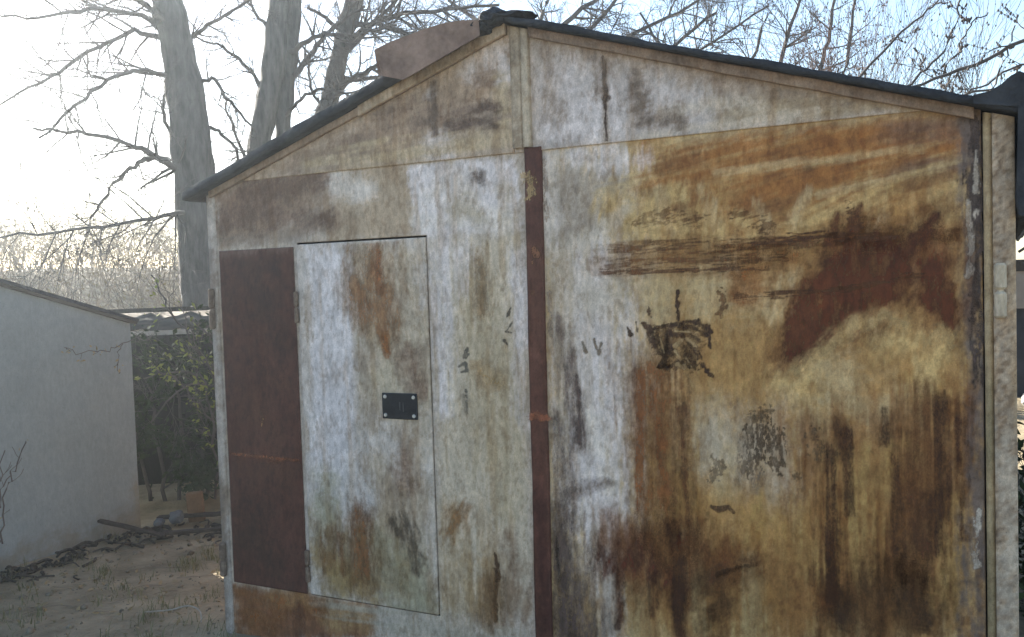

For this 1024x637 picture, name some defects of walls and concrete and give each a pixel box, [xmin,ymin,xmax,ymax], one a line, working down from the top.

damp [430,81,497,136]
rust [345,243,401,358]
peeling [627,287,728,378]
rust [602,202,966,376]
rust [320,505,373,586]
rust [594,334,754,637]
peeling [707,455,726,483]
peeling [739,405,799,486]
rust [804,384,973,637]